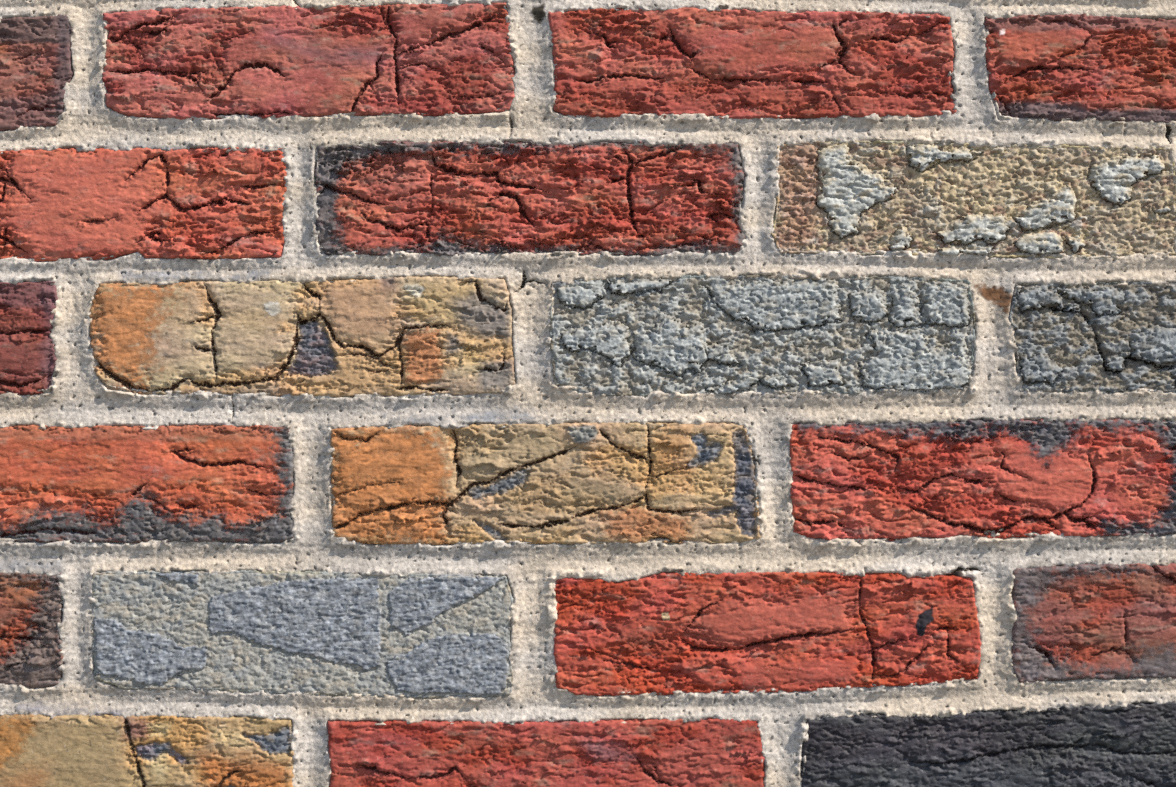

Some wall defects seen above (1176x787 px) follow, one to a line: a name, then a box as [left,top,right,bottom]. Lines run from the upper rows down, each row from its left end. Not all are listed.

crack [108,17,292,119]
crack [577,19,946,114]
crack [82,154,277,254]
crack [322,153,547,238]
spalling [773,142,1176,257]
crack [98,283,458,420]
spalling [552,277,974,396]
spalling [1012,283,1176,391]
crack [334,430,576,529]
crack [501,427,702,543]
crack [793,437,1097,540]
crack [681,577,963,680]